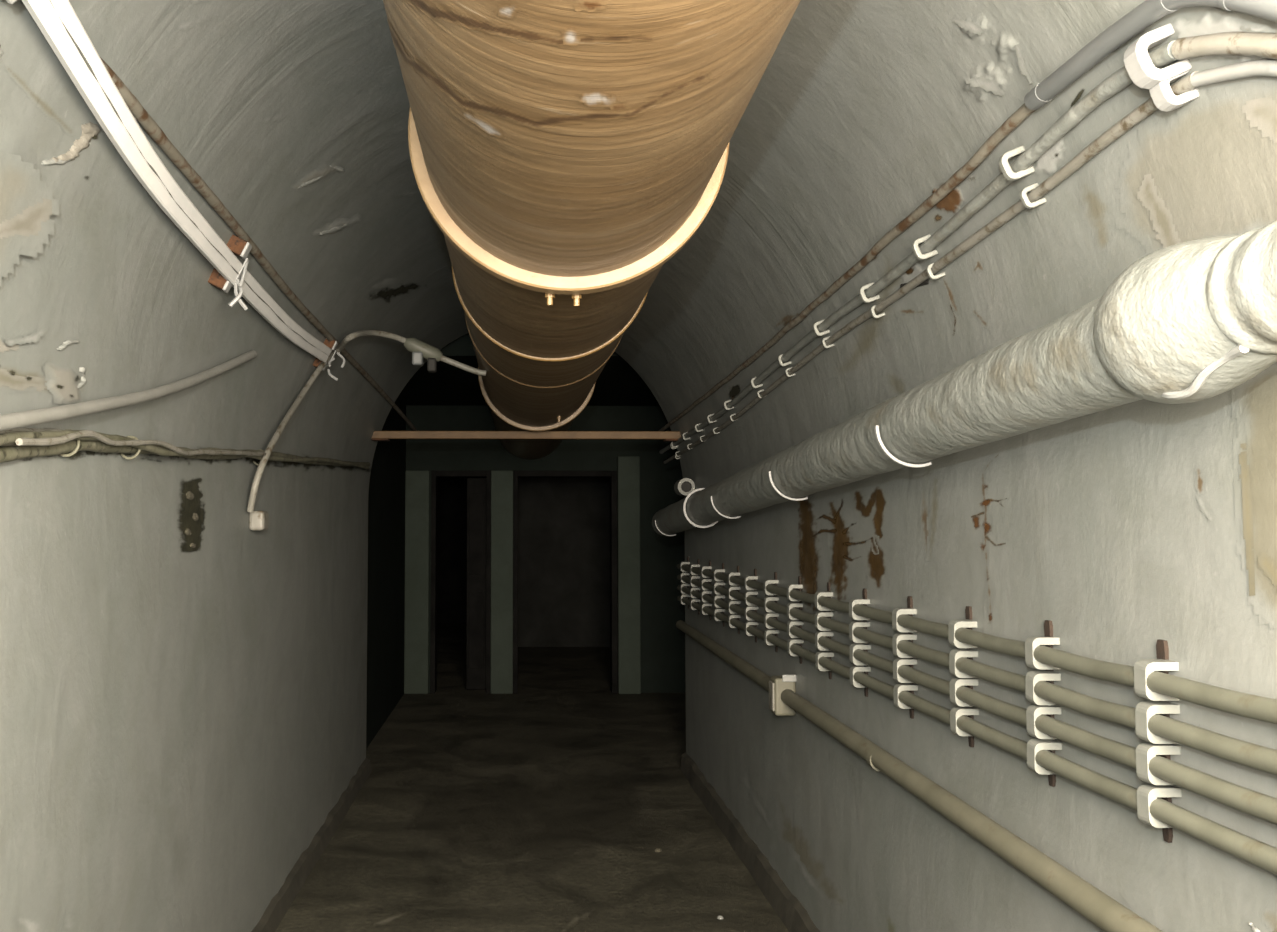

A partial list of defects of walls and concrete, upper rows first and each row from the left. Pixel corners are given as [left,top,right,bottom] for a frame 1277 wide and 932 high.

spalling [179,478,205,552]
corrosion [795,485,889,613]
damp [1231,362,1277,629]